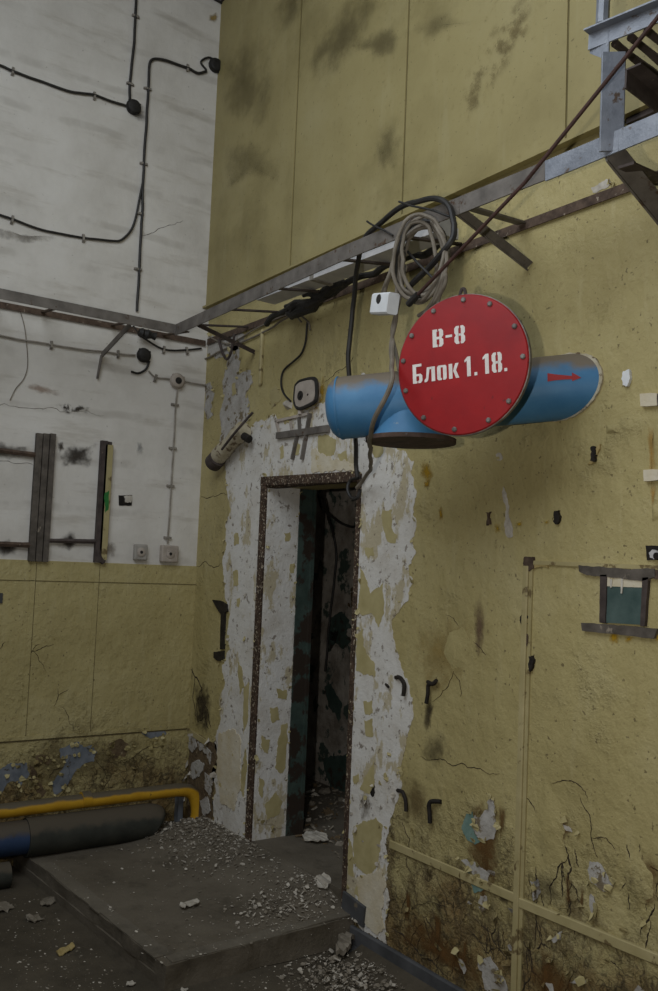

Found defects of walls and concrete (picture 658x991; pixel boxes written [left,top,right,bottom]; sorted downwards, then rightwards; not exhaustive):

peeling [182,328,417,956]
peeling [0,726,166,798]
peeling [458,793,501,844]
peeling [452,857,513,927]
crack [392,780,658,991]
peeling [557,861,615,921]
peeling [434,942,512,991]
peeling [526,931,591,987]